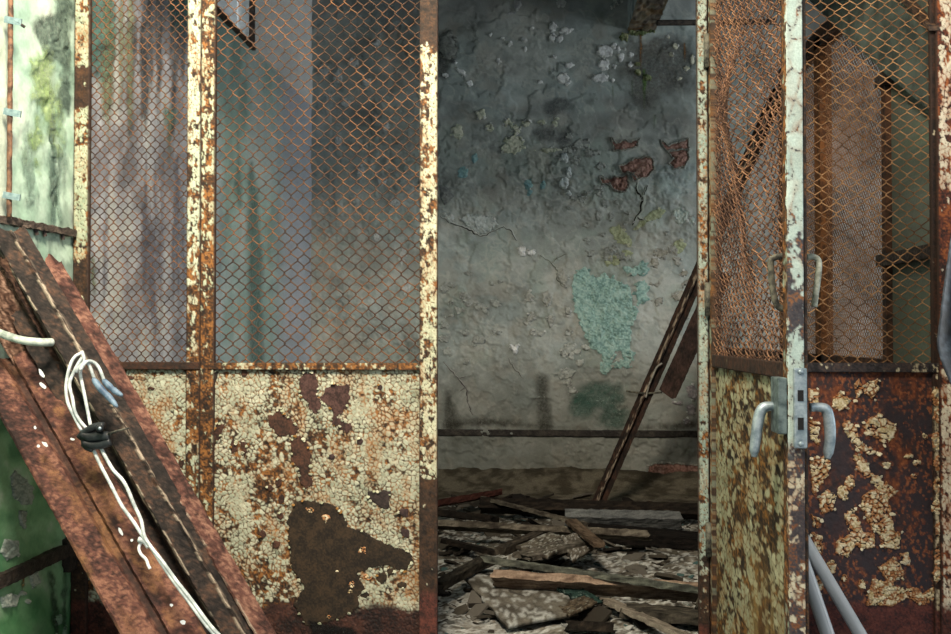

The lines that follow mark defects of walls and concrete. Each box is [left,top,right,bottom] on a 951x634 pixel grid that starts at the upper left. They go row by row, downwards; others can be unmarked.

peeling [549,22,574,43]
water stain [35,0,75,114]
peeling [591,42,634,83]
water stain [49,139,67,225]
crack [440,215,517,241]
peeling [475,109,696,307]
crack [632,182,648,226]
crack [540,254,565,287]
rust [298,371,363,445]
rust [214,423,248,457]
rust [257,407,414,626]